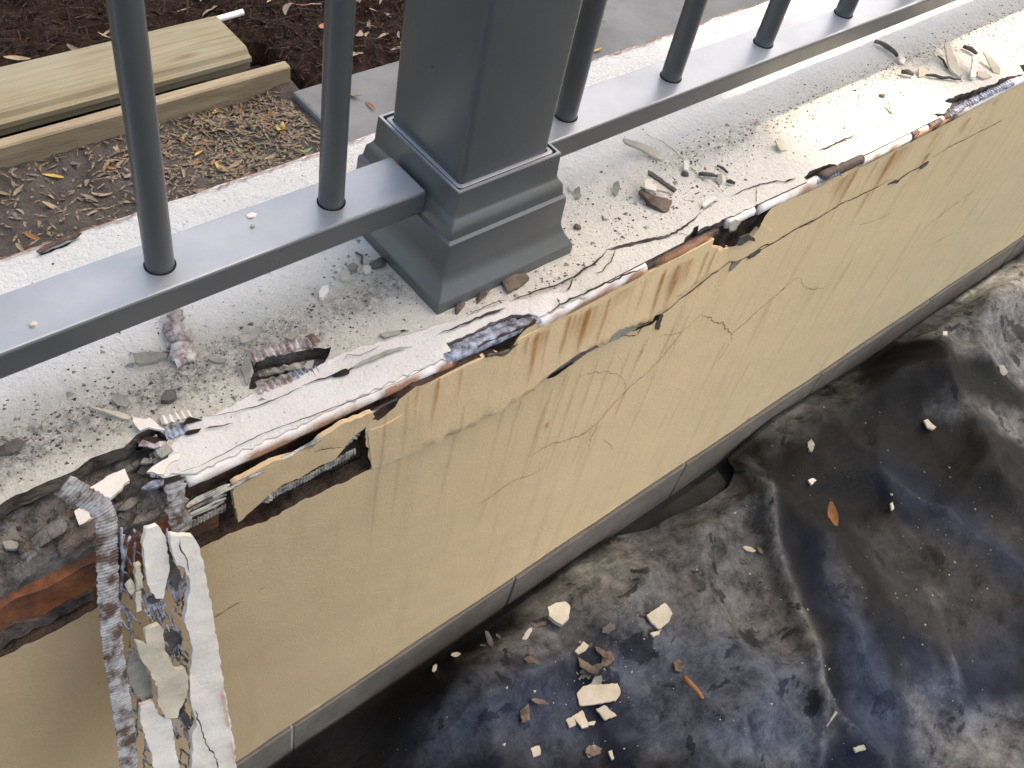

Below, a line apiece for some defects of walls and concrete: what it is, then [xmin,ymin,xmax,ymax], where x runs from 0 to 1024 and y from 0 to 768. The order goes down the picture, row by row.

spalling [815,154,865,184]
corrosion [873,116,959,170]
corrosion [655,235,711,303]
corrosion [566,287,612,333]
crack [441,118,1006,501]
spalling [241,332,326,395]
corrosion [380,377,418,399]
spalling [80,389,202,612]
flaking render [183,398,398,537]
spalling [0,491,98,650]
peeling [533,601,570,628]
peeling [134,622,189,768]